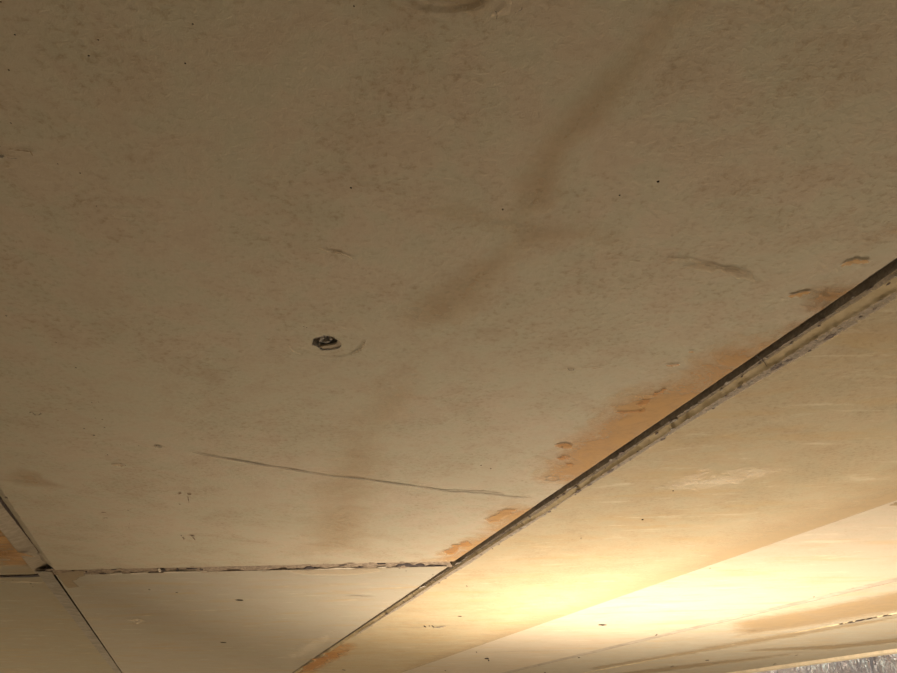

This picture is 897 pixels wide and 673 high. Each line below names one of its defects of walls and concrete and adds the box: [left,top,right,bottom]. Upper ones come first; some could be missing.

corrosion [550,341,776,481]
crack [193,452,521,498]
corrosion [444,509,530,560]